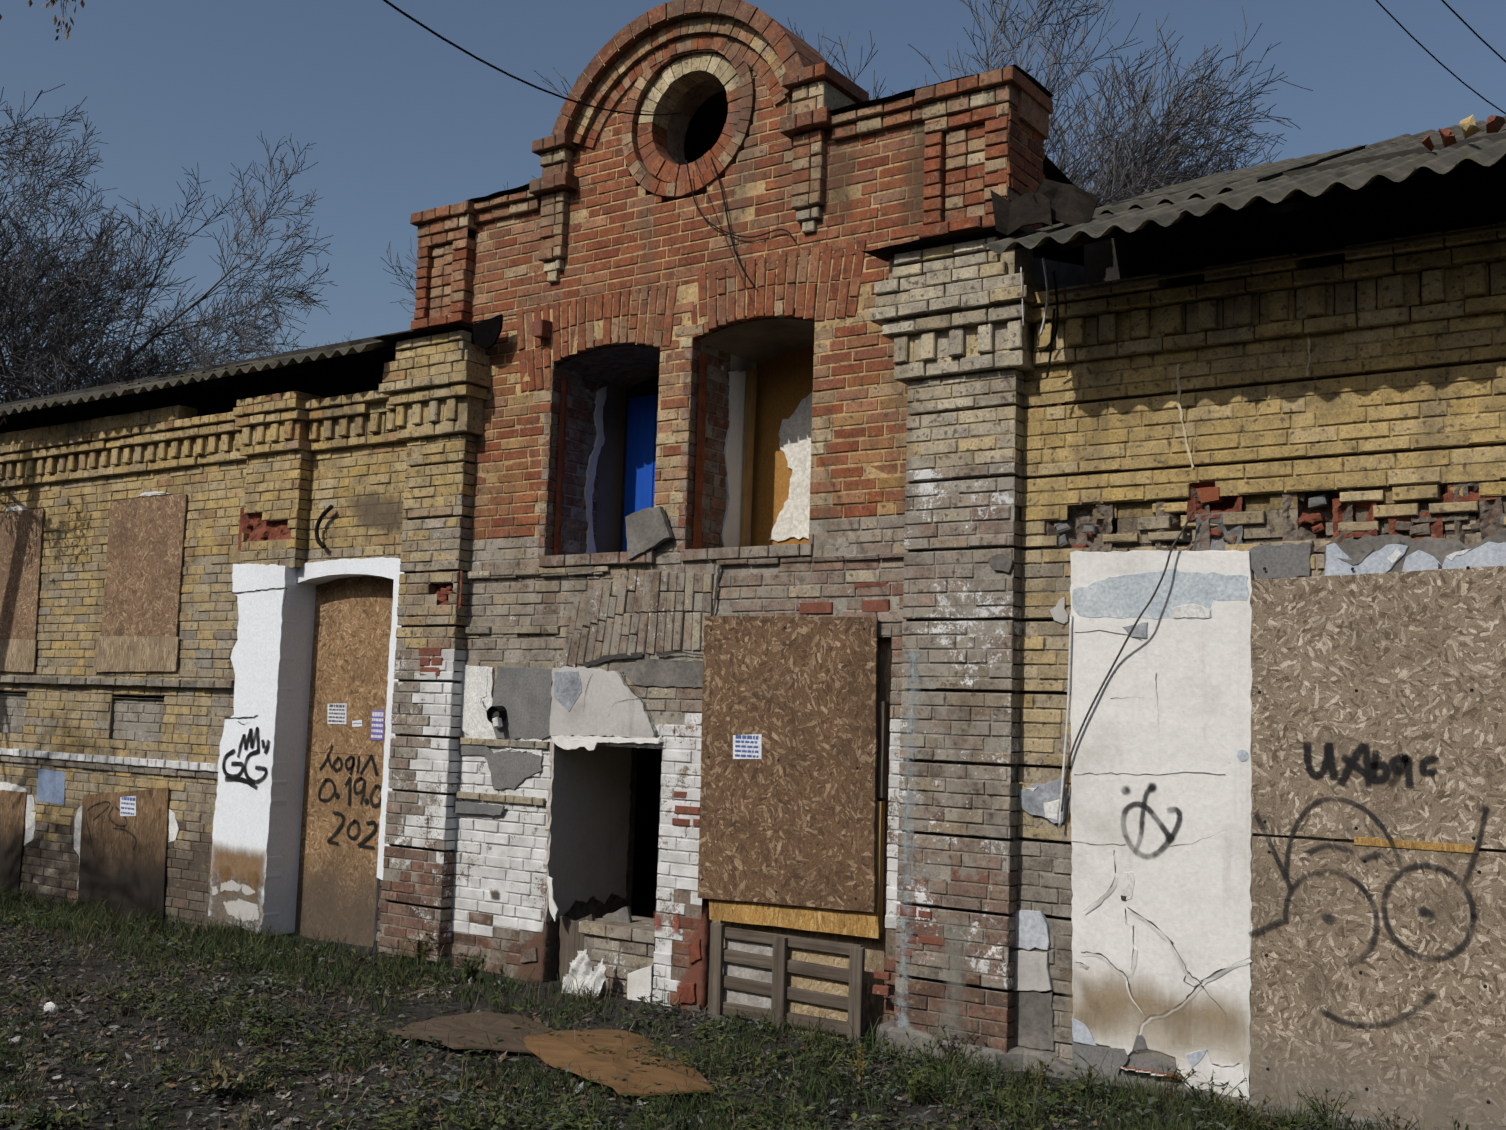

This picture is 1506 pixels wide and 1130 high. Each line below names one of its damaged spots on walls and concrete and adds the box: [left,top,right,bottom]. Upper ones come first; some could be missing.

spalling [238,507,300,551]
spalling [1041,503,1113,552]
peeling [1072,481,1249,638]
spalling [1282,480,1506,576]
flaking render [419,647,443,676]
peeling [460,664,661,758]
flaking render [672,791,700,827]
damp [205,847,264,933]
spalling [674,914,706,1012]
crack [1072,841,1252,1052]
damp [1084,983,1240,1053]